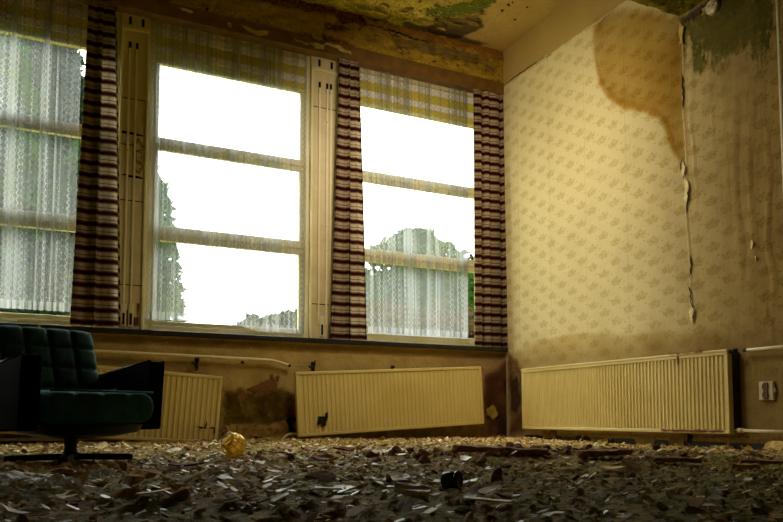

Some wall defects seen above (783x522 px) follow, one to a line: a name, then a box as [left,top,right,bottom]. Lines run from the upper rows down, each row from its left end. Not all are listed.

peeling [294,0,492,72]
leakage [683,0,776,75]
spalling [223,415,297,440]